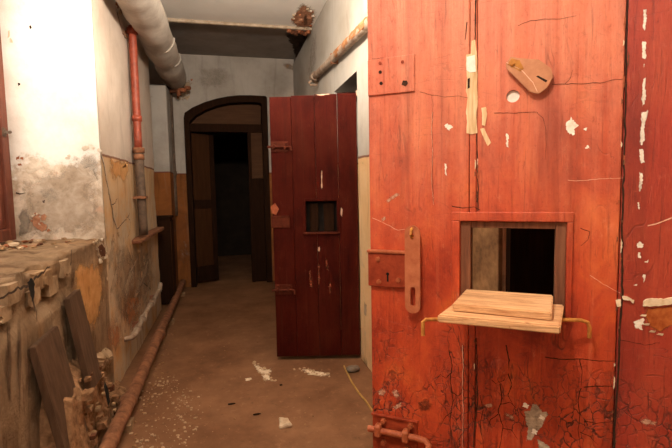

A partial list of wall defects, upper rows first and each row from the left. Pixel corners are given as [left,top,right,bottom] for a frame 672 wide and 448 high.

peeling [566,117,587,135]
peeling [639,78,648,163]
flaking render [26,154,95,232]
crack [101,153,131,232]
flaking render [93,238,108,264]
crack [0,266,50,320]
spalling [0,258,72,324]
peeling [634,297,672,336]
crack [436,345,464,448]
crack [480,345,517,448]
peeling [523,403,550,448]
crack [545,357,613,448]